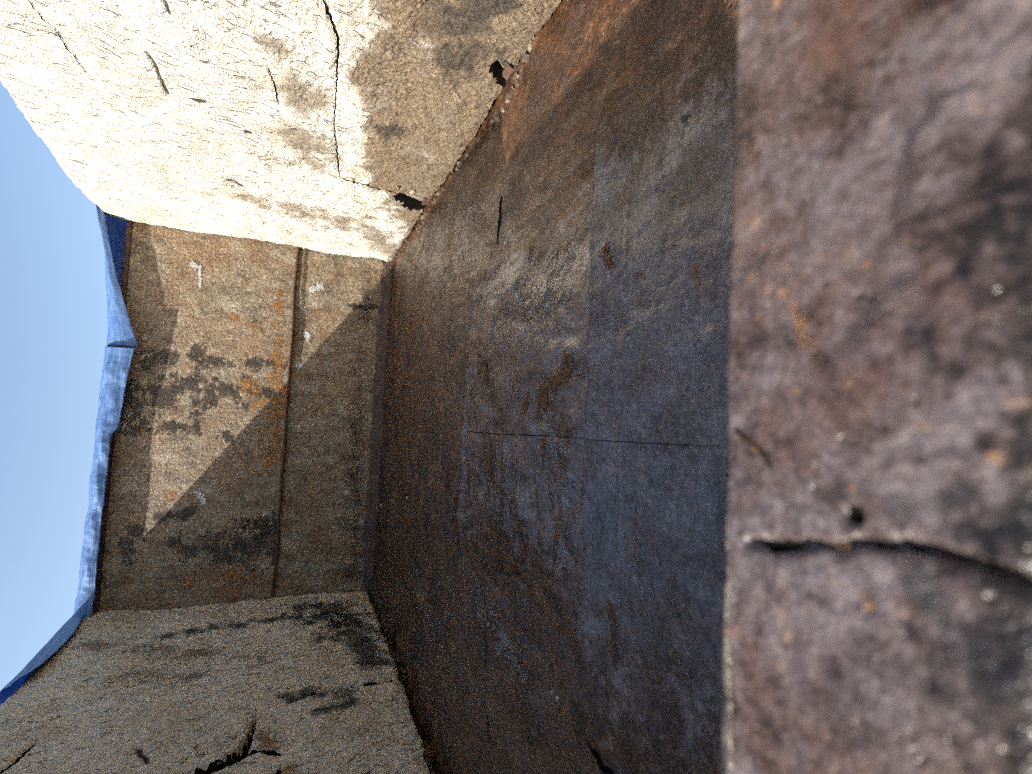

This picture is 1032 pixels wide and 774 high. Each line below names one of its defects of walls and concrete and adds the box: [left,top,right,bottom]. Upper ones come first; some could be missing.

crack [322,0,415,194]
corrosion [229,290,287,474]
corrosion [521,349,582,421]
crack [465,427,773,469]
crack [752,538,1032,583]
crack [0,744,36,774]
crack [164,721,281,774]
crack [587,743,613,774]